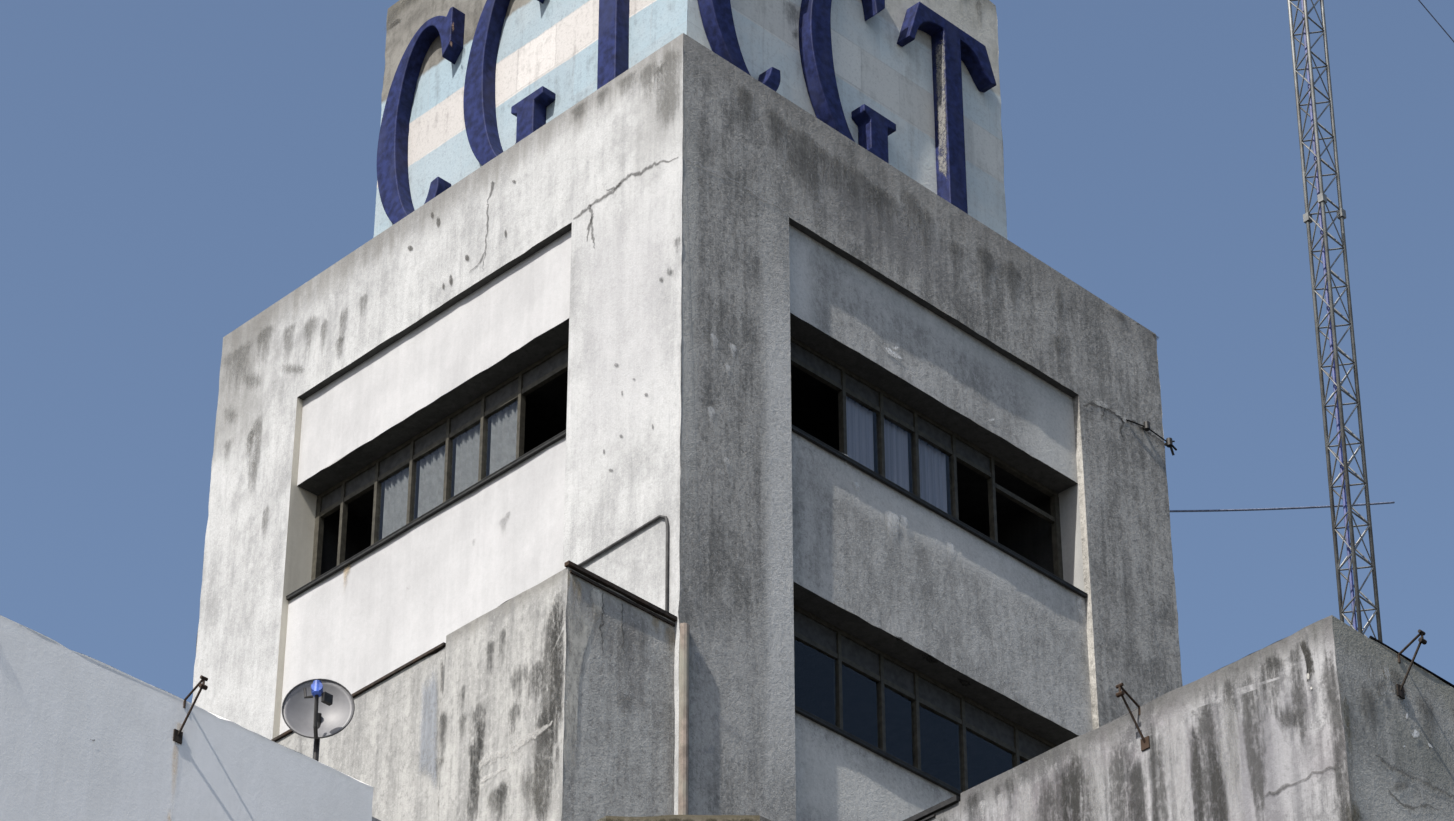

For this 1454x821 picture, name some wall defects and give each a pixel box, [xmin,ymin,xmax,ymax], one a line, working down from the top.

leakage [469,710,484,814]
leakage [513,589,604,815]
leakage [1040,764,1095,821]
leakage [1110,741,1167,821]
leakage [1191,651,1304,821]
leakage [1325,666,1360,821]